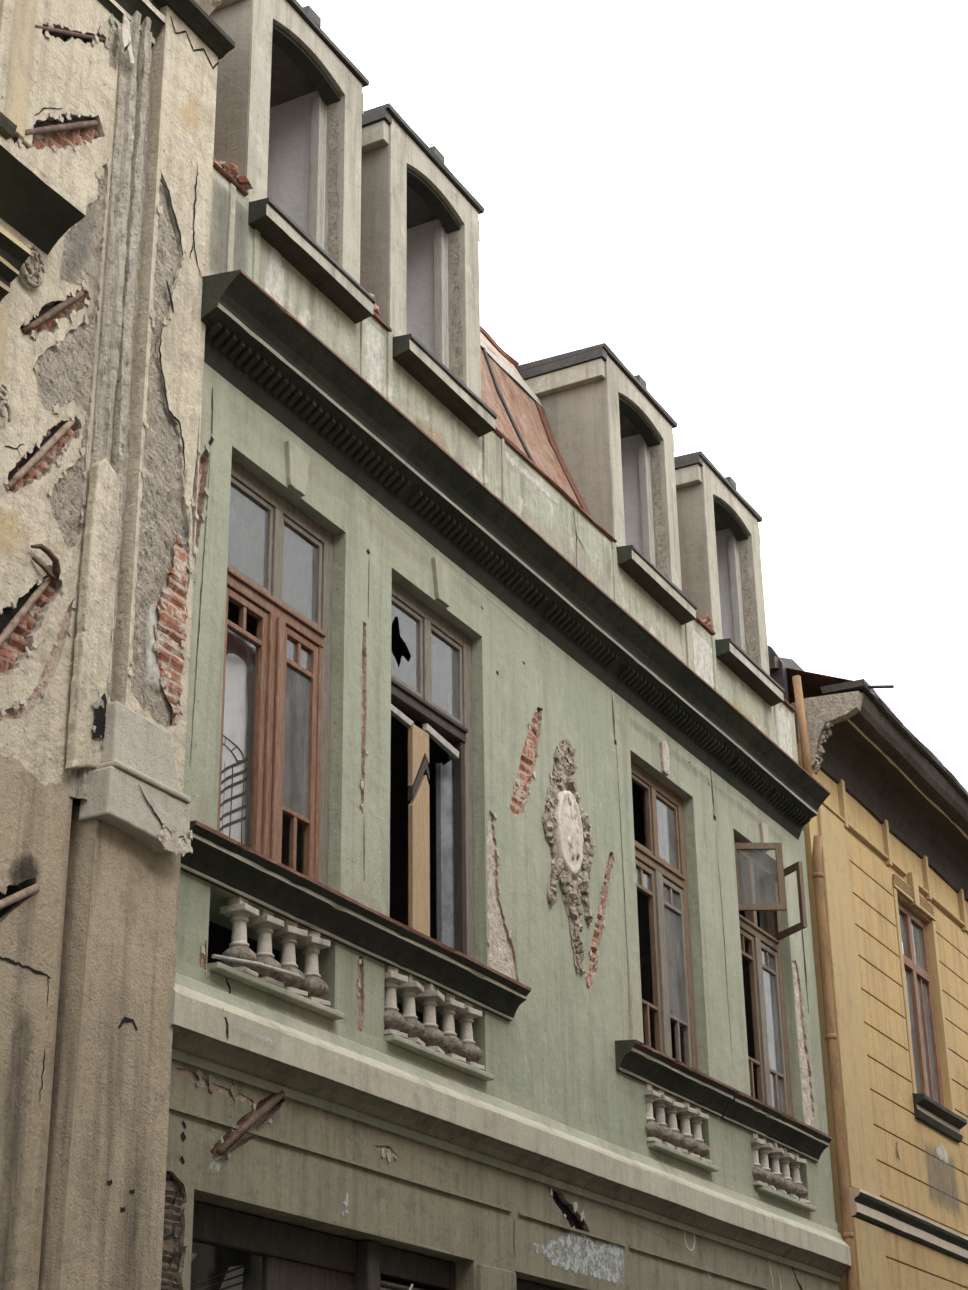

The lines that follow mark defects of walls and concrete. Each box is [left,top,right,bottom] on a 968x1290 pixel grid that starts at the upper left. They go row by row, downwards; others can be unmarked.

peeling [42,13,135,69]
flaking render [12,112,100,152]
flaking render [4,165,106,549]
flaking render [128,178,211,728]
flaking render [0,565,77,721]
peeling [487,709,583,981]
flaking render [551,835,615,989]
peeling [792,961,815,1125]